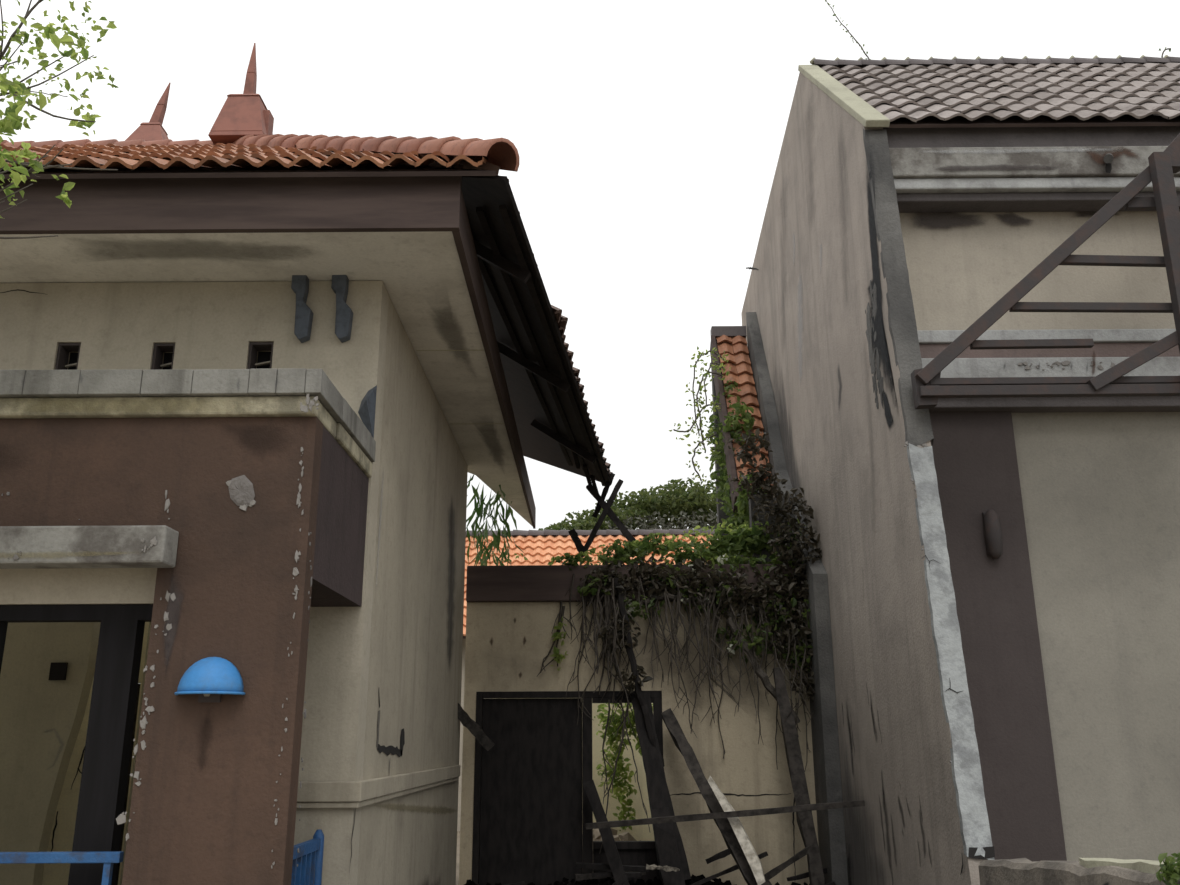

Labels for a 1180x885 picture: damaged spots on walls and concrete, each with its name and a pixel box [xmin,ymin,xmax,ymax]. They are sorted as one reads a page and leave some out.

damp [867,164,895,428]
spalling [226,475,256,511]
peeling [292,447,312,623]
peeling [154,591,176,636]
peeling [130,650,159,786]
peeling [116,811,135,841]